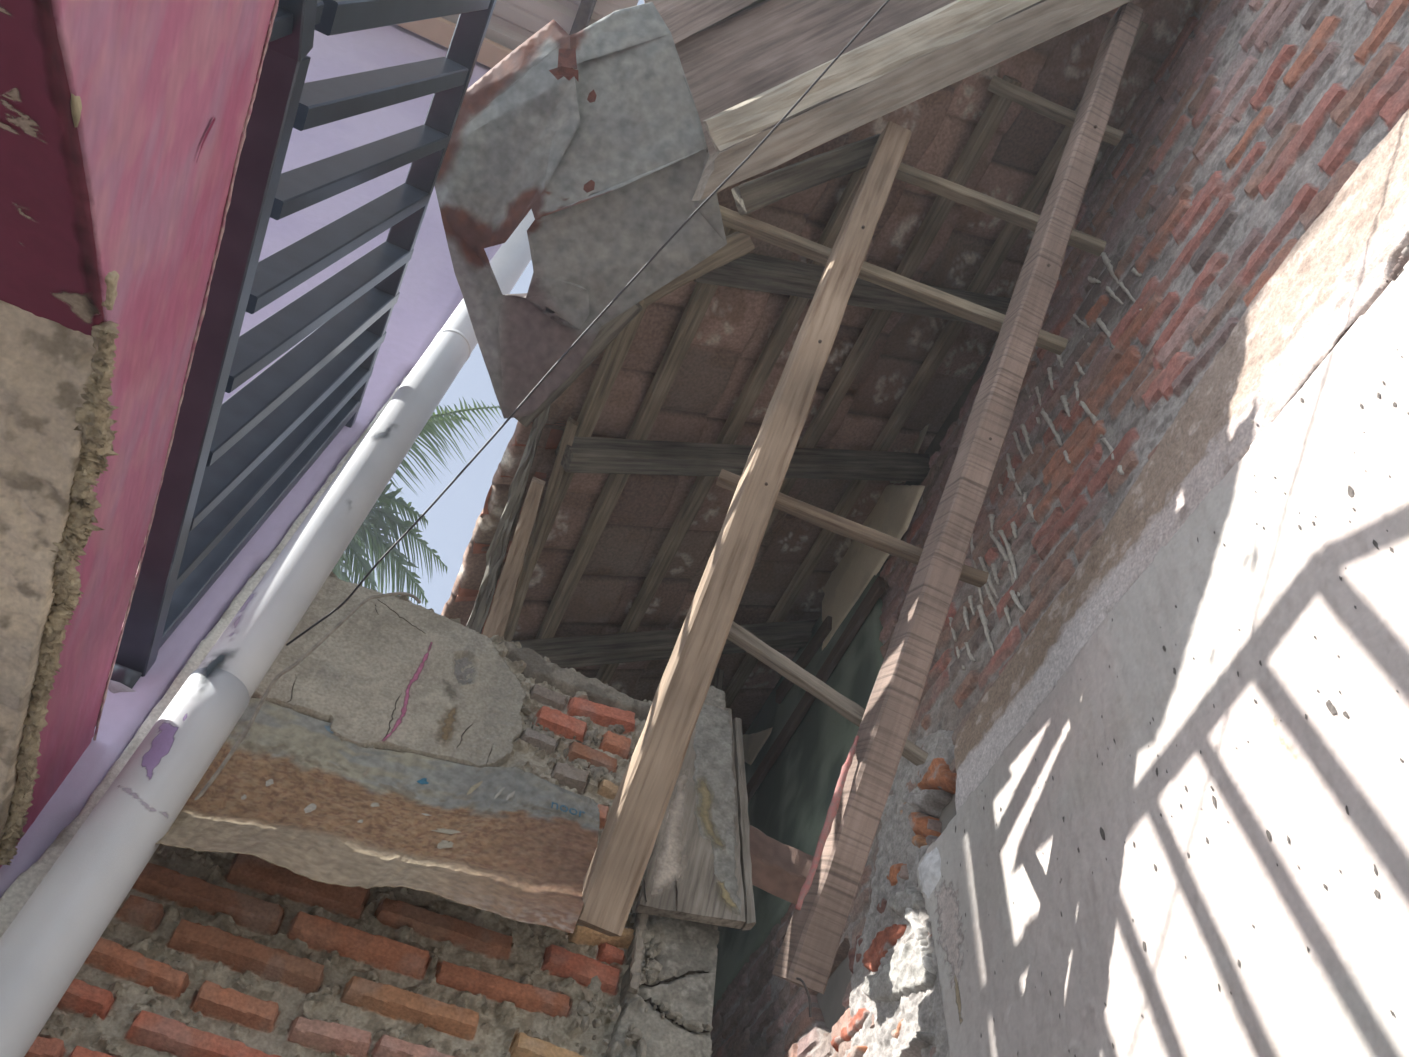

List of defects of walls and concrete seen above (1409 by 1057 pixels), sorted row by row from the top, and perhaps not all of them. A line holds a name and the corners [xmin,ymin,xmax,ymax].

rust [549,66,597,103]
peeling [71,93,82,128]
rust [583,180,595,193]
spalling [831,728,957,1057]
crack [639,970,710,1033]